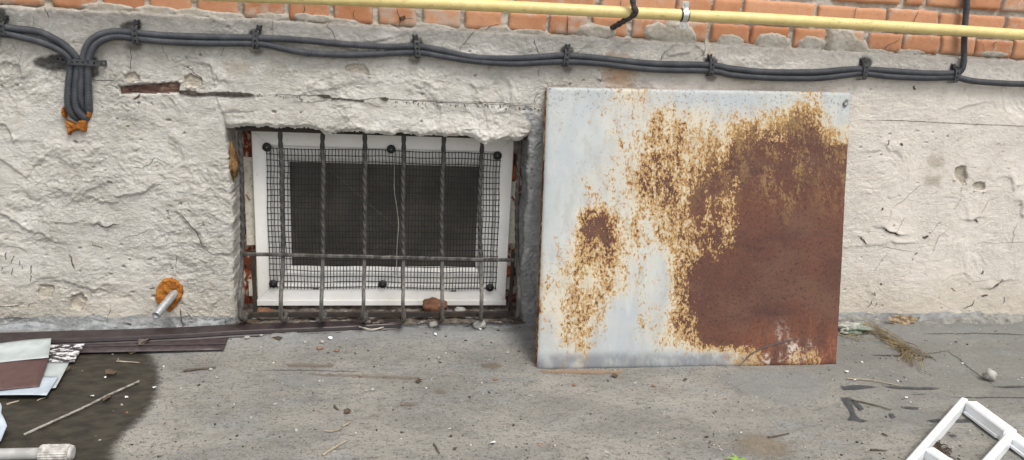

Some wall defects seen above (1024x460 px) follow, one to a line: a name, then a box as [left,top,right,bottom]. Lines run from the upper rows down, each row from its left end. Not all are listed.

spalling [121,72,300,99]
crack [361,40,543,113]
crack [879,119,1014,127]
leakage [0,352,159,460]